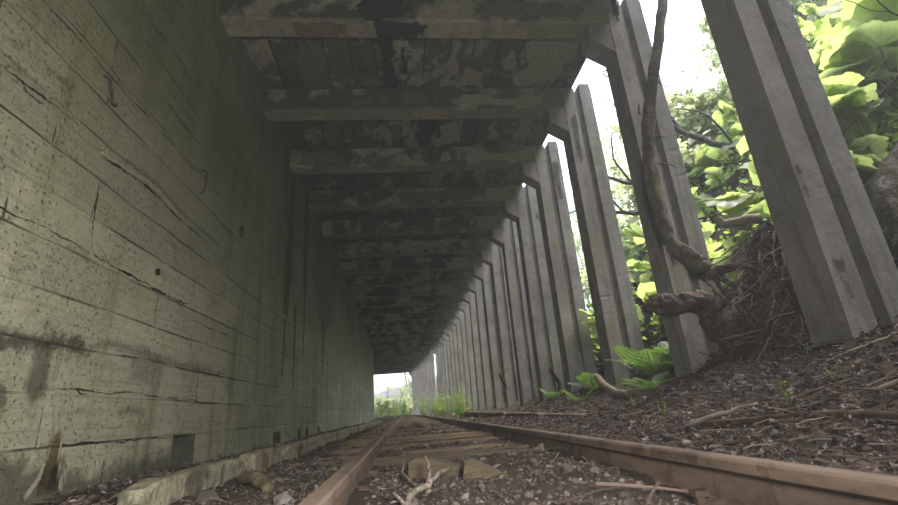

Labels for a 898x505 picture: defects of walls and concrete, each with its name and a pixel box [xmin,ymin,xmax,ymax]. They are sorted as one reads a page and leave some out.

crack [0,181,239,341]